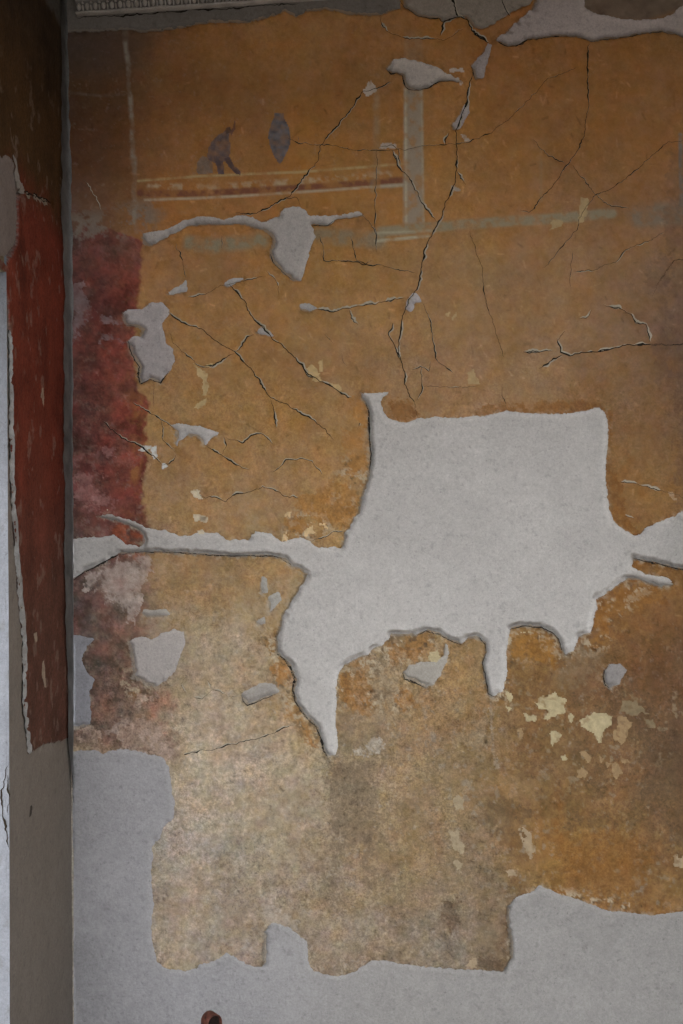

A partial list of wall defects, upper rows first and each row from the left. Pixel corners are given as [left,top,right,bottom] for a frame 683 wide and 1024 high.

crack [380,0,488,43]
peeling [363,80,377,96]
crack [235,45,682,415]
crack [171,245,351,502]
crack [102,390,175,465]
crack [622,480,682,498]
peeling [193,514,208,534]
crack [184,725,289,755]
peeling [504,689,656,779]
peeling [448,829,466,871]
peeling [518,827,537,859]
peeling [673,854,683,868]